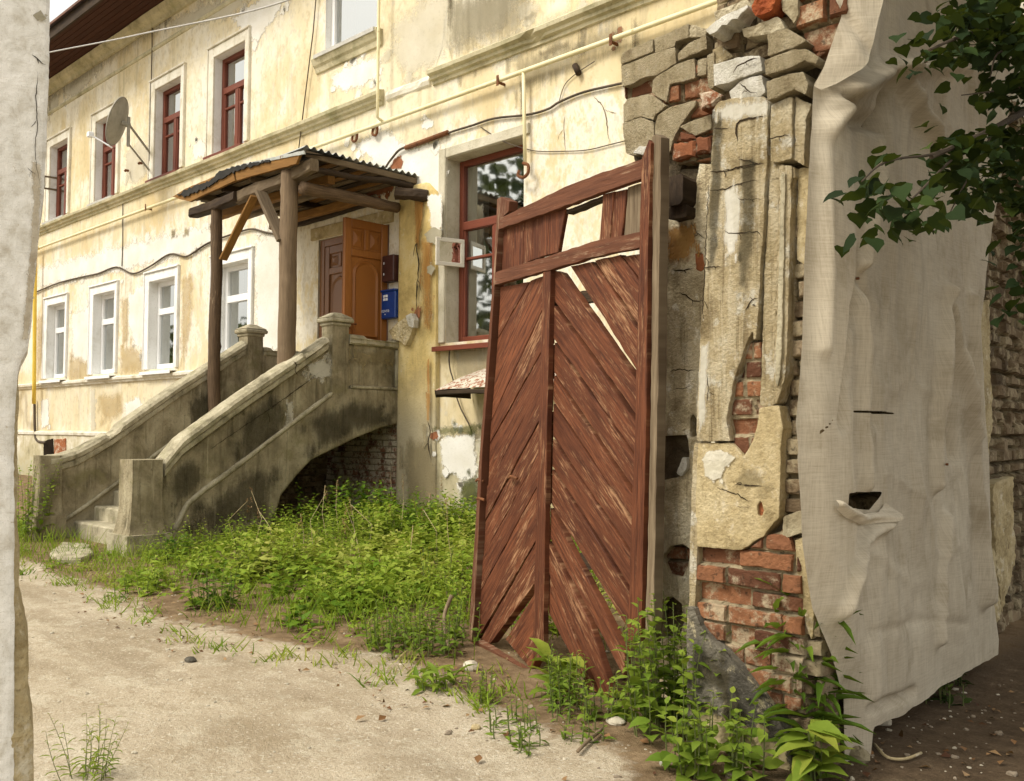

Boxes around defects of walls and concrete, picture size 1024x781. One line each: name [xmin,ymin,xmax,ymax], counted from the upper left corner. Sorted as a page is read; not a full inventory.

peeling [232,0,289,51]
peeling [330,0,537,98]
crack [674,58,788,338]
rust [668,223,700,262]
damp [165,464,200,500]
damp [191,396,208,423]
damp [196,470,278,538]
damp [231,398,293,459]
damp [303,403,391,455]
peeling [430,422,478,492]
flaking render [702,342,764,484]
flaking render [696,529,810,711]